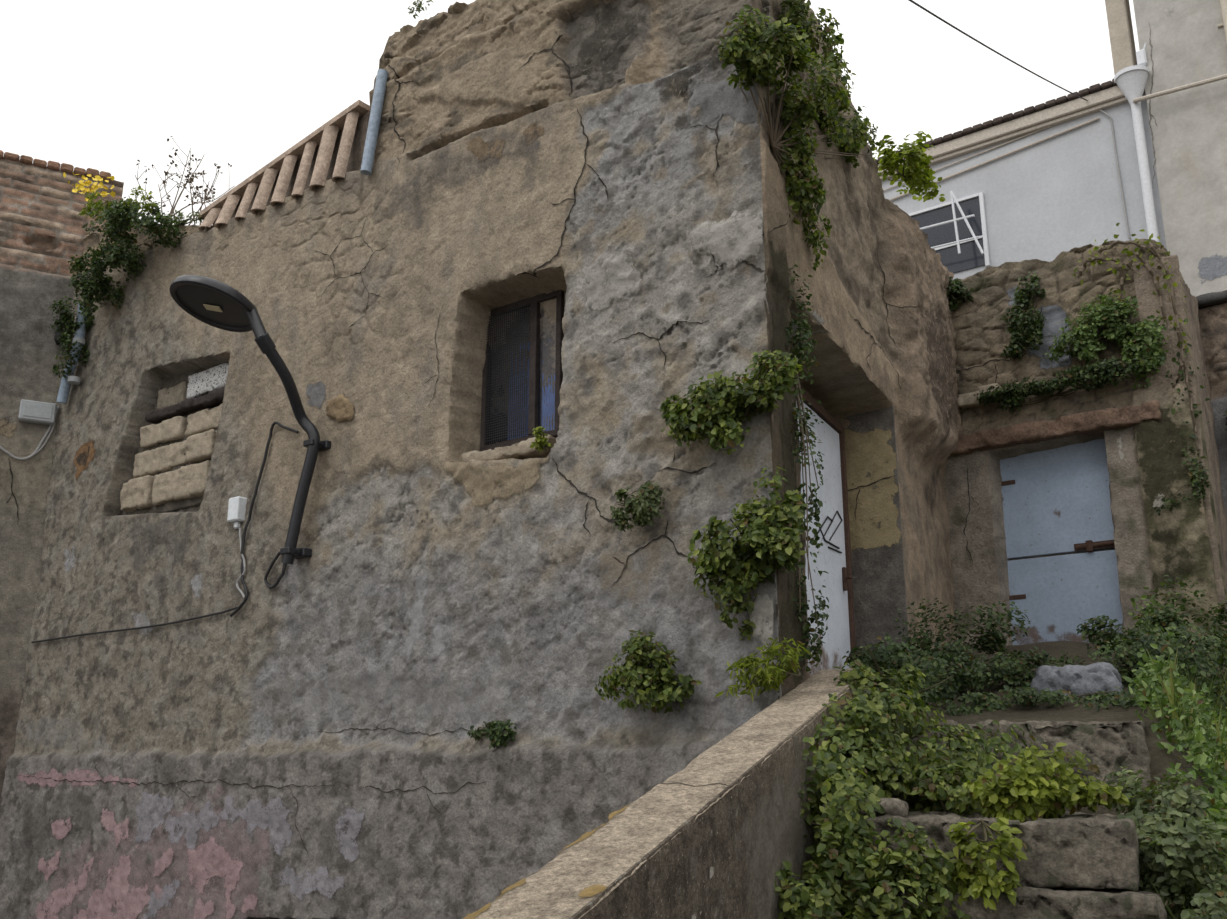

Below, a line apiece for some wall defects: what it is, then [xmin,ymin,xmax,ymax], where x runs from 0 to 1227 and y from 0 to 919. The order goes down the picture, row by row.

crack [517,35,609,277]
crack [6,458,19,520]
crack [552,456,695,587]
crack [630,446,717,495]
peeling [844,428,901,552]
peeling [17,768,345,919]
peeling [335,806,365,862]